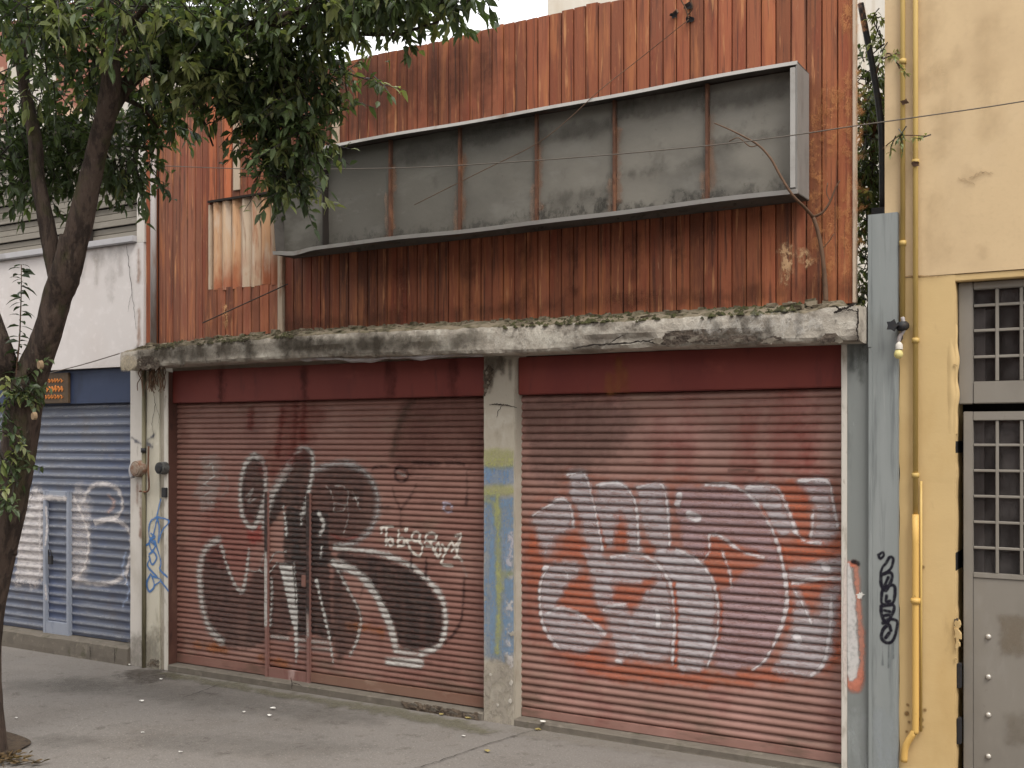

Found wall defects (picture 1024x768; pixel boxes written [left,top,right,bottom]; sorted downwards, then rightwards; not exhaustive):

water stain [539,190,695,227]
peeling [780,244,811,281]
crack [573,335,667,349]
spalling [662,331,781,346]
spalling [818,333,843,344]
crack [830,303,859,341]